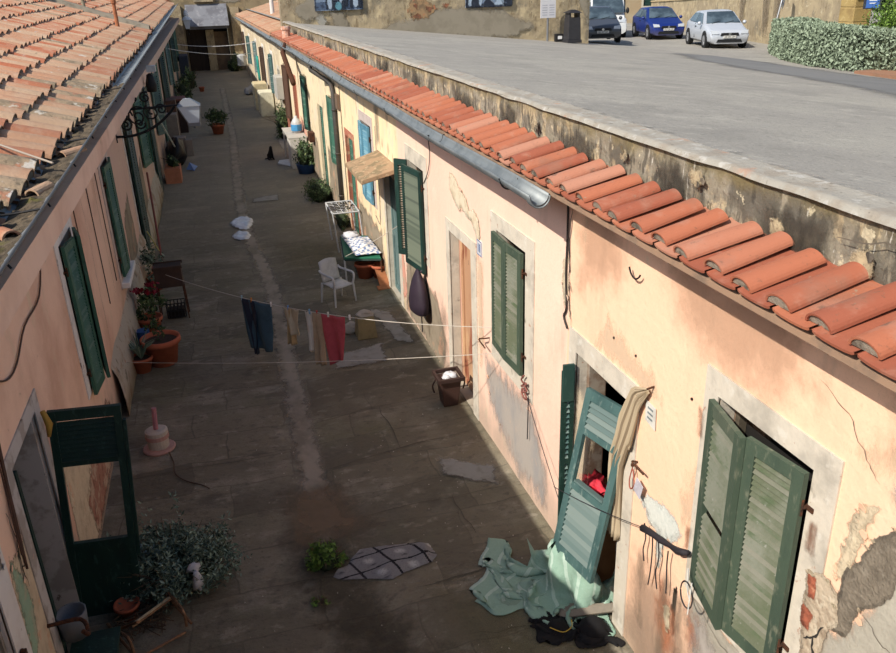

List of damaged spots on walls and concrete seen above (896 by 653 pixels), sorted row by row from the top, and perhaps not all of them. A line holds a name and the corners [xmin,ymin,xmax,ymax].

spalling [407,0,449,20]
peeling [448,172,480,240]
crack [821,380,878,482]
peeling [640,494,682,569]
peeling [0,542,56,653]
peeling [687,597,739,653]
spalling [799,502,896,653]